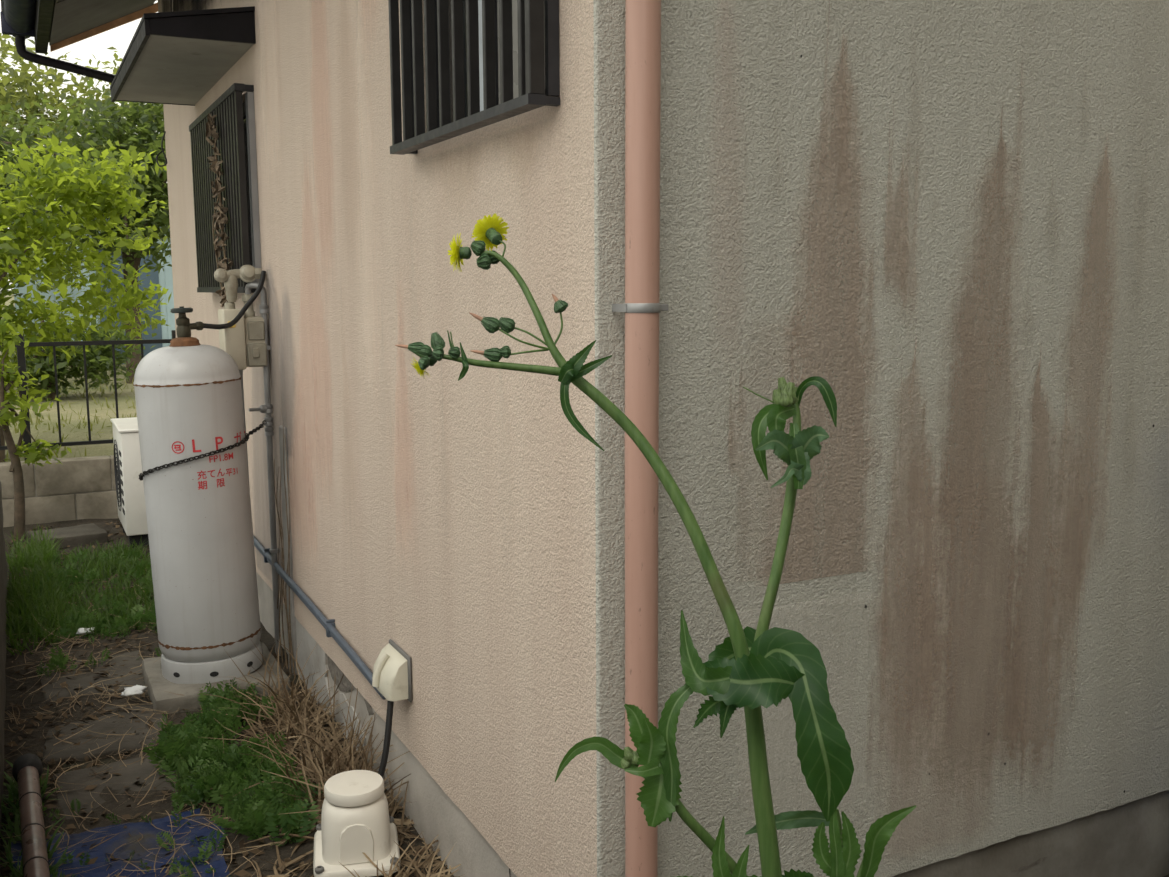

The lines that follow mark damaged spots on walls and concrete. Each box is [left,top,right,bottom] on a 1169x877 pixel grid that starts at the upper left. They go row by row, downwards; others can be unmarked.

leakage [794,202,830,431]
leakage [786,244,867,583]